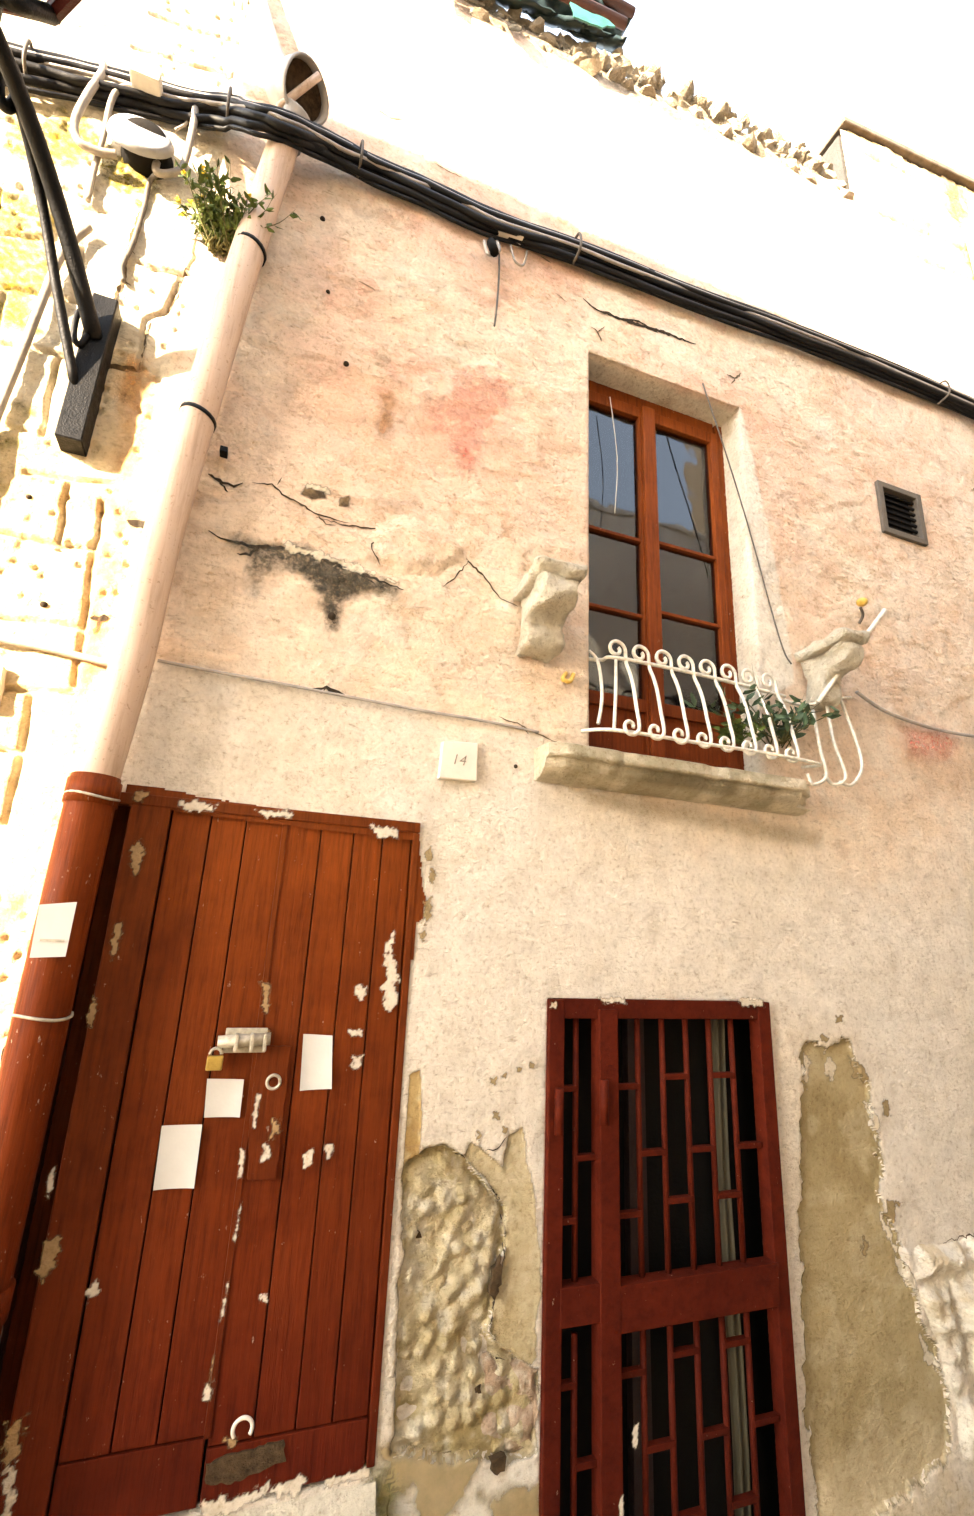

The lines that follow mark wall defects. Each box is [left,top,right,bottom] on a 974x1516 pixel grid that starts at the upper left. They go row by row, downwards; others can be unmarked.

crack [110,201,225,372]
crack [208,474,403,590]
crack [444,558,517,606]
peeling [490,1062,535,1085]
peeling [465,1111,542,1476]
peeling [797,1015,951,1516]